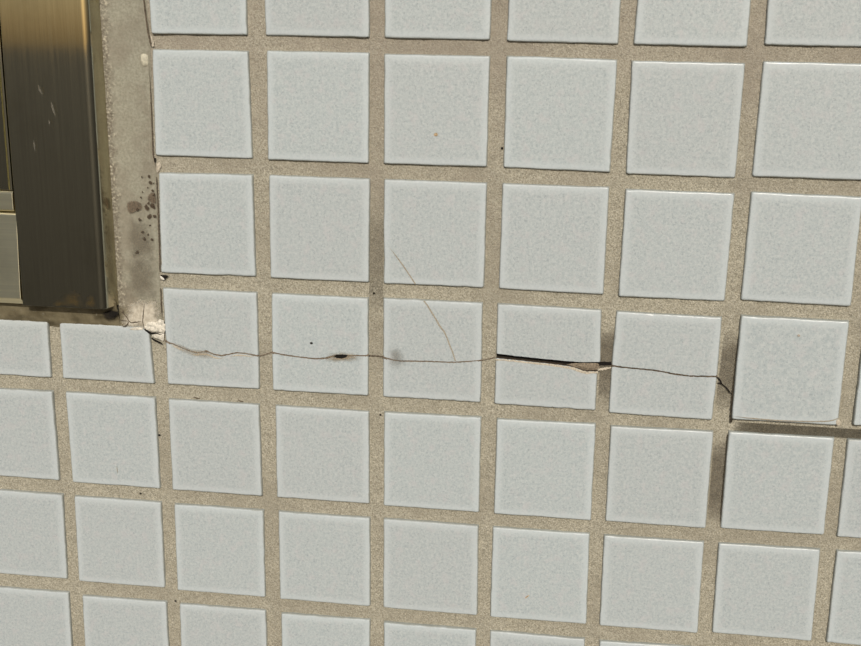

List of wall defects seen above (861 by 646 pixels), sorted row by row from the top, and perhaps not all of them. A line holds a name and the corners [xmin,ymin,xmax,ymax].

peeling [130,319,166,341]
crack [165,251,841,520]